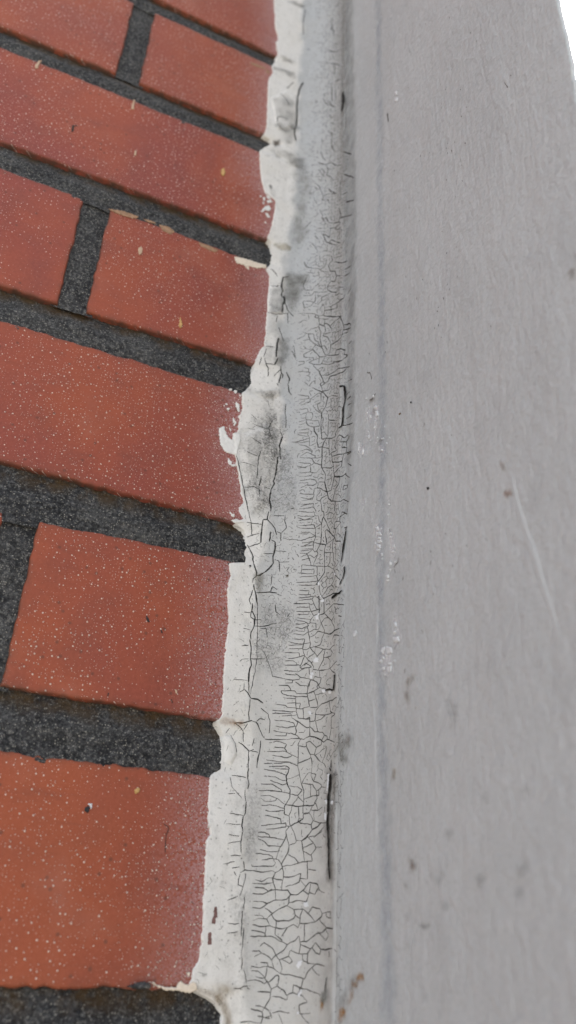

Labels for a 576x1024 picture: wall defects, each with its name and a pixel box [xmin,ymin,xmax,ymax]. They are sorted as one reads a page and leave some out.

peeling [219,389,241,467]
crack [191,0,354,1024]